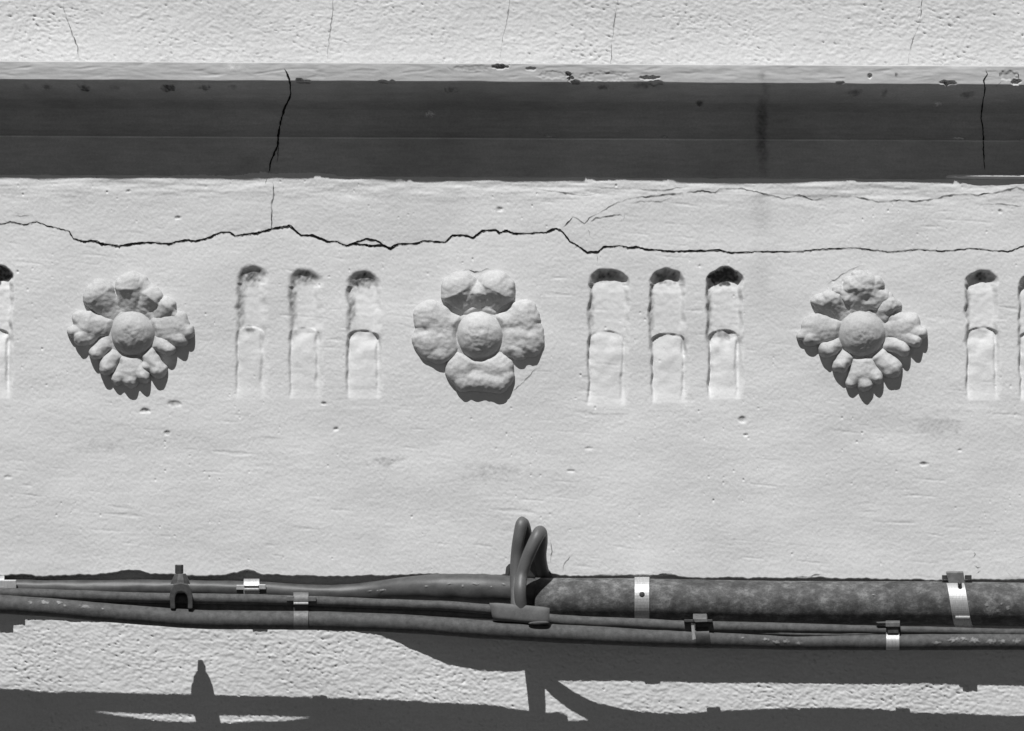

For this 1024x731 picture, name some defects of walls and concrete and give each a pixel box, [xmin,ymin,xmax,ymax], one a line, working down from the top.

crack [0,70,1024,281]